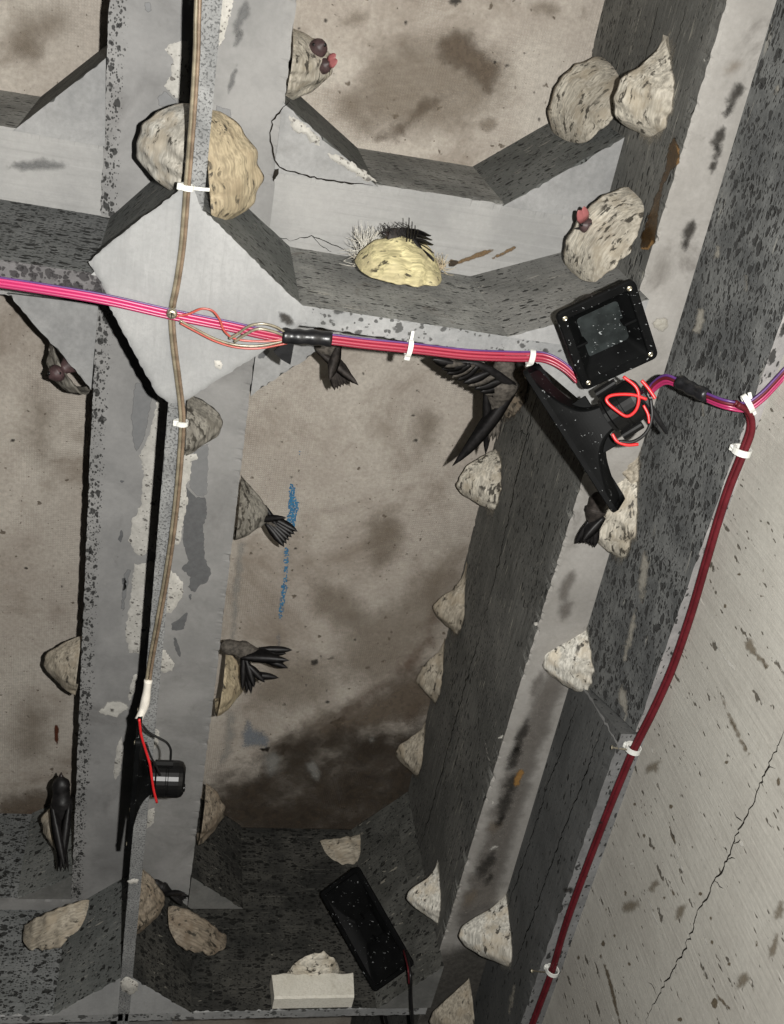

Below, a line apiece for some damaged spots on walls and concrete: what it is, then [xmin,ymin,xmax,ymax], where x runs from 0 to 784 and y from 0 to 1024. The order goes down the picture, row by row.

peeling [158,40,190,106]
water stain [440,34,508,92]
crack [269,99,368,185]
spalling [289,116,376,182]
rust [641,138,680,250]
peeling [118,383,168,654]
spalling [161,444,211,673]
peeling [113,736,124,780]
water stain [219,660,431,829]
water stain [460,675,561,923]
crack [646,732,784,1024]
water stain [415,948,487,1024]